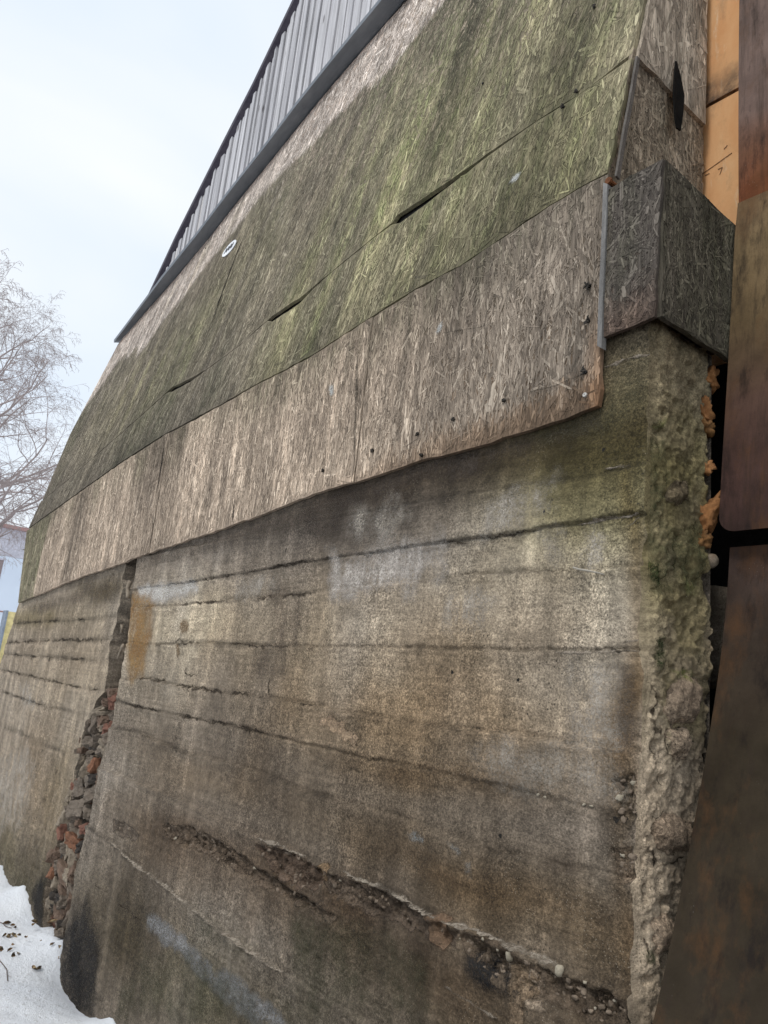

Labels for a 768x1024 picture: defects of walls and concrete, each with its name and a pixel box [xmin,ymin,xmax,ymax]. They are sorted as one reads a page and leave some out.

rust [128,595,152,682]
spalling [612,775,637,828]
spalling [613,846,638,884]
spalling [163,823,630,1024]